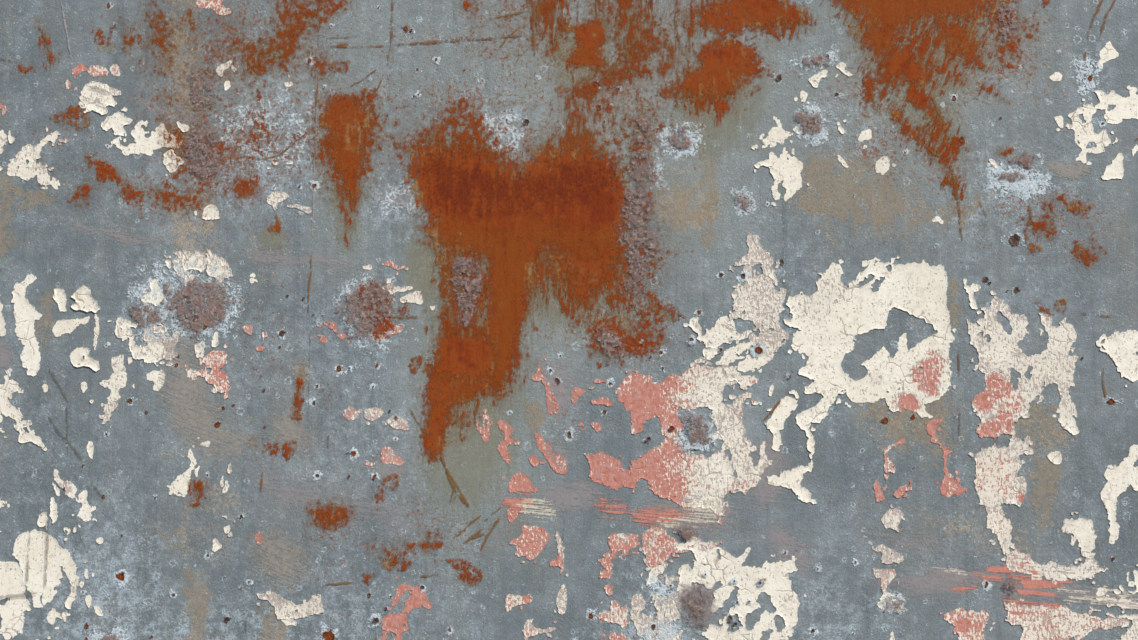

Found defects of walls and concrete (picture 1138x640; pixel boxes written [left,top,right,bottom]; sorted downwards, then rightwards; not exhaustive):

corrosion [0,20,60,73]
peeling [65,62,189,176]
peeling [751,116,809,207]
corrosion [789,0,1050,200]
peeling [1054,41,1138,180]
peeling [164,249,233,287]
corrosion [67,0,817,507]
peeling [0,274,48,451]
peeling [52,279,234,467]
peeling [153,438,232,500]
peeling [531,233,1138,640]
peeling [367,577,433,640]